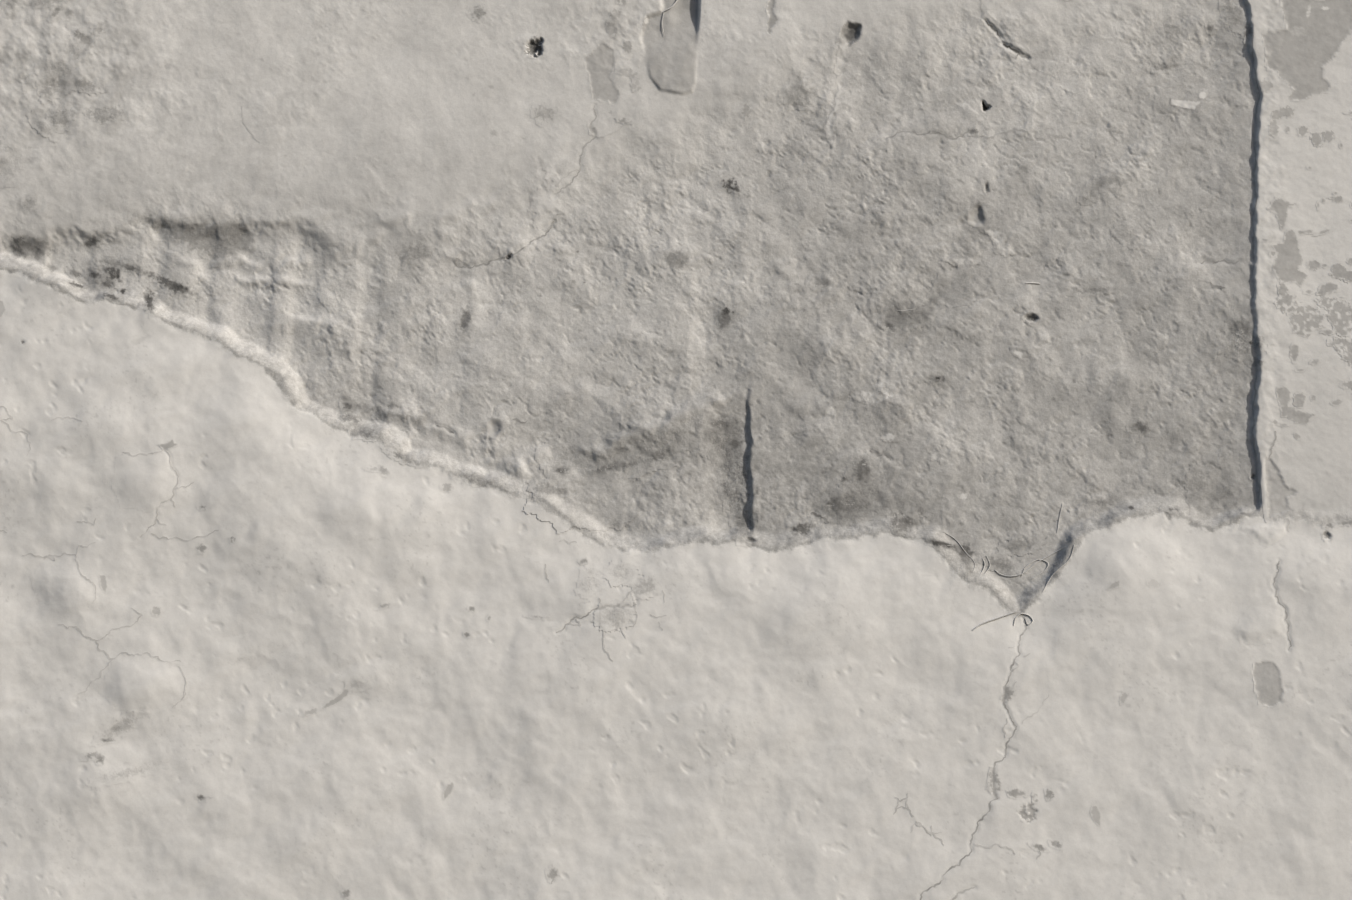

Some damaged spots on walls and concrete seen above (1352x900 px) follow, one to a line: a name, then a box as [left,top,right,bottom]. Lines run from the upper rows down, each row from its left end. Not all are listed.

spalling [0,0,1352,618]
crack [893,615,1049,900]